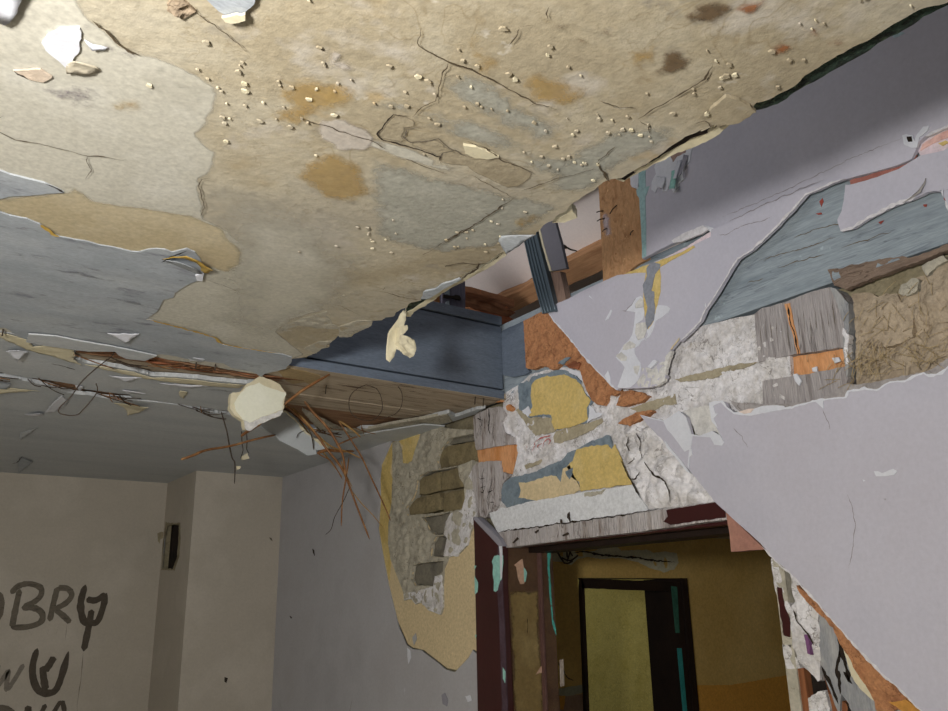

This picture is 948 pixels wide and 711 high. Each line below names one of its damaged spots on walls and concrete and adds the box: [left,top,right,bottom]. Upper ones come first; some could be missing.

leakage [687,4,729,21]
leakage [282,85,349,121]
crack [301,118,385,149]
crack [416,29,554,113]
crack [601,64,713,133]
leakage [657,52,687,73]
peeling [0,0,372,359]
leakage [302,156,553,252]
crack [423,142,615,279]
spalling [630,351,758,412]
peeling [501,369,632,507]
spalling [379,427,487,670]